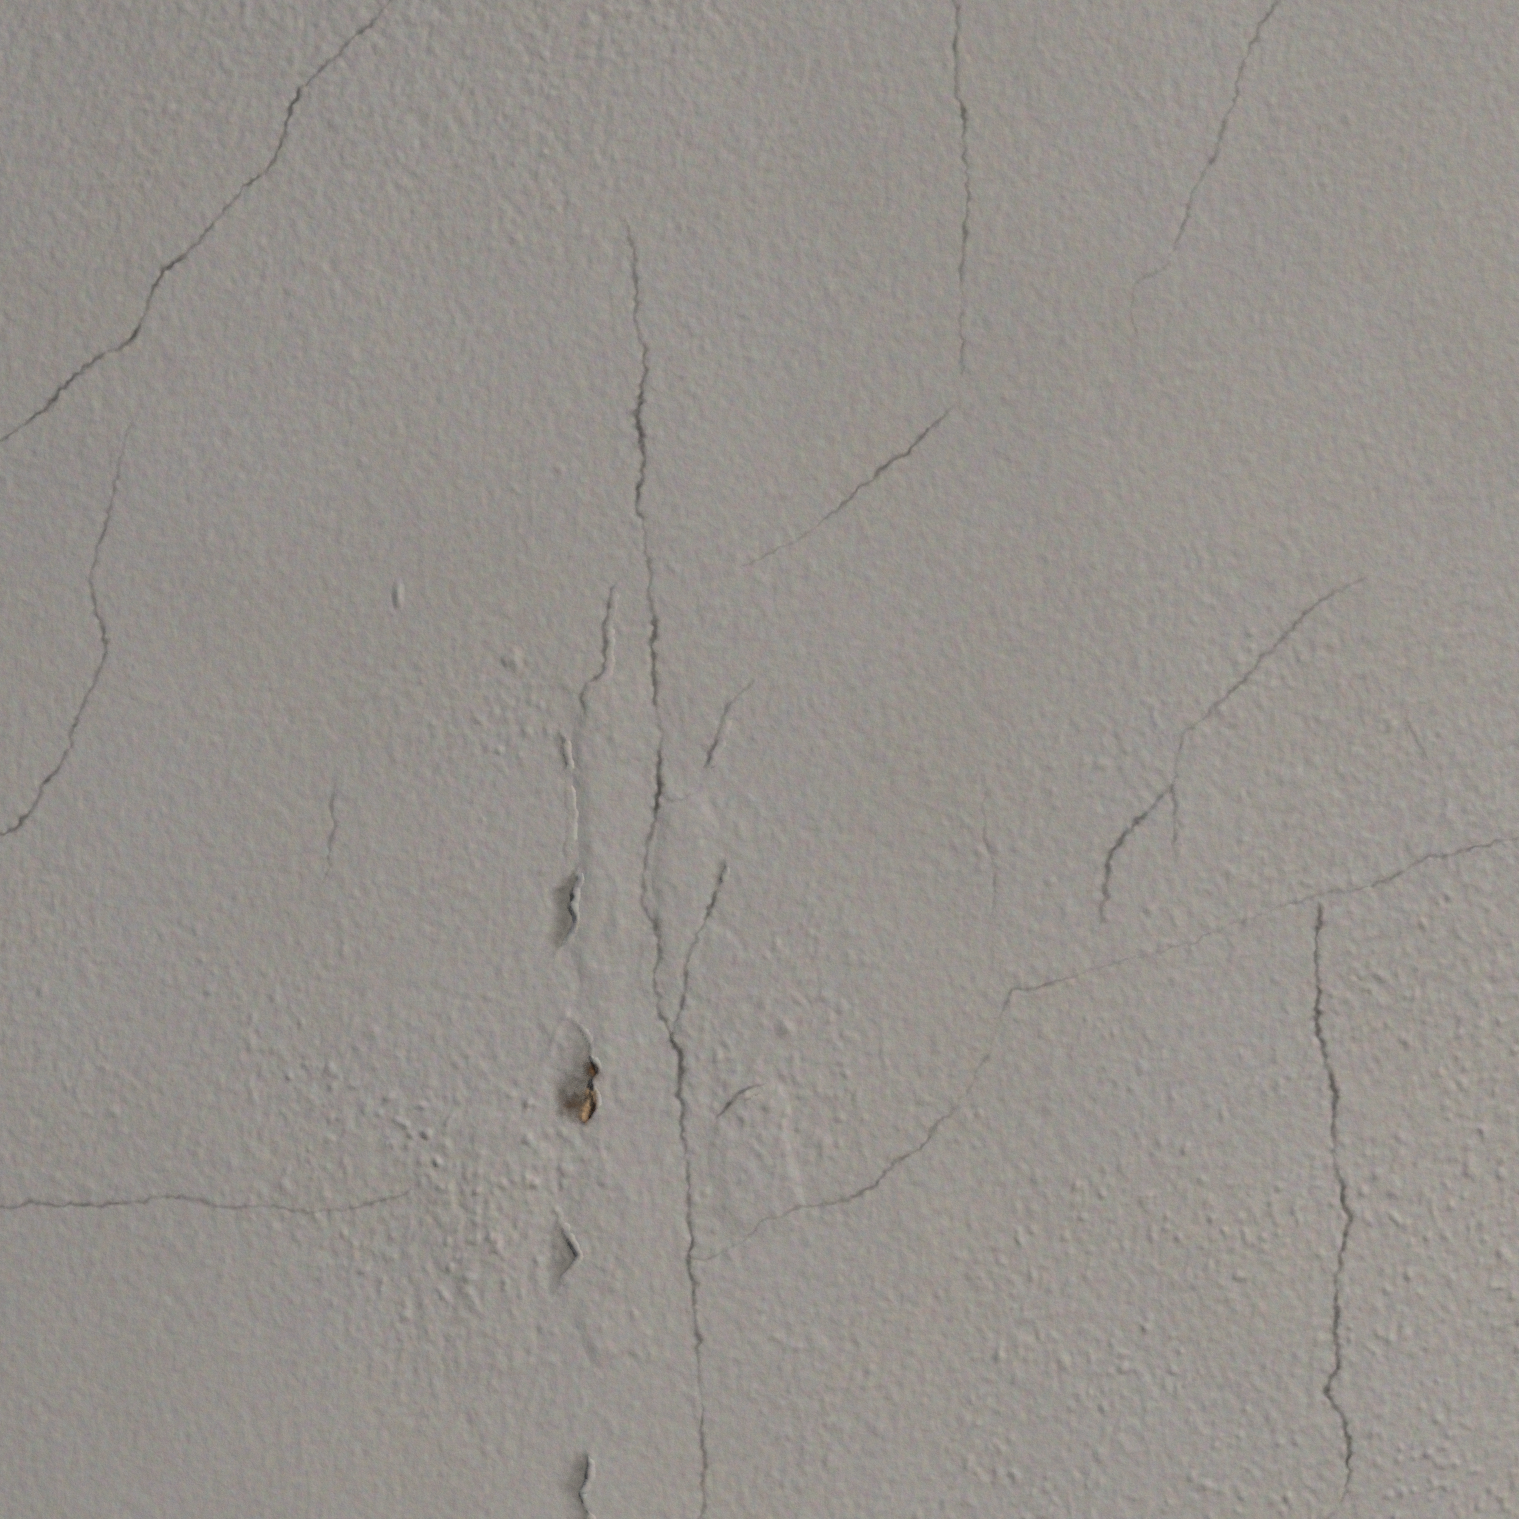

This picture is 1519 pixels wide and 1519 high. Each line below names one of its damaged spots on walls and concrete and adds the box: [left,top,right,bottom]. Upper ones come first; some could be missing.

crack [653,763,661,810]
flaking render [559,732,585,946]
corrosion [564,1066,597,1123]
flaking render [557,1223,584,1288]
flaking render [572,1454,596,1519]